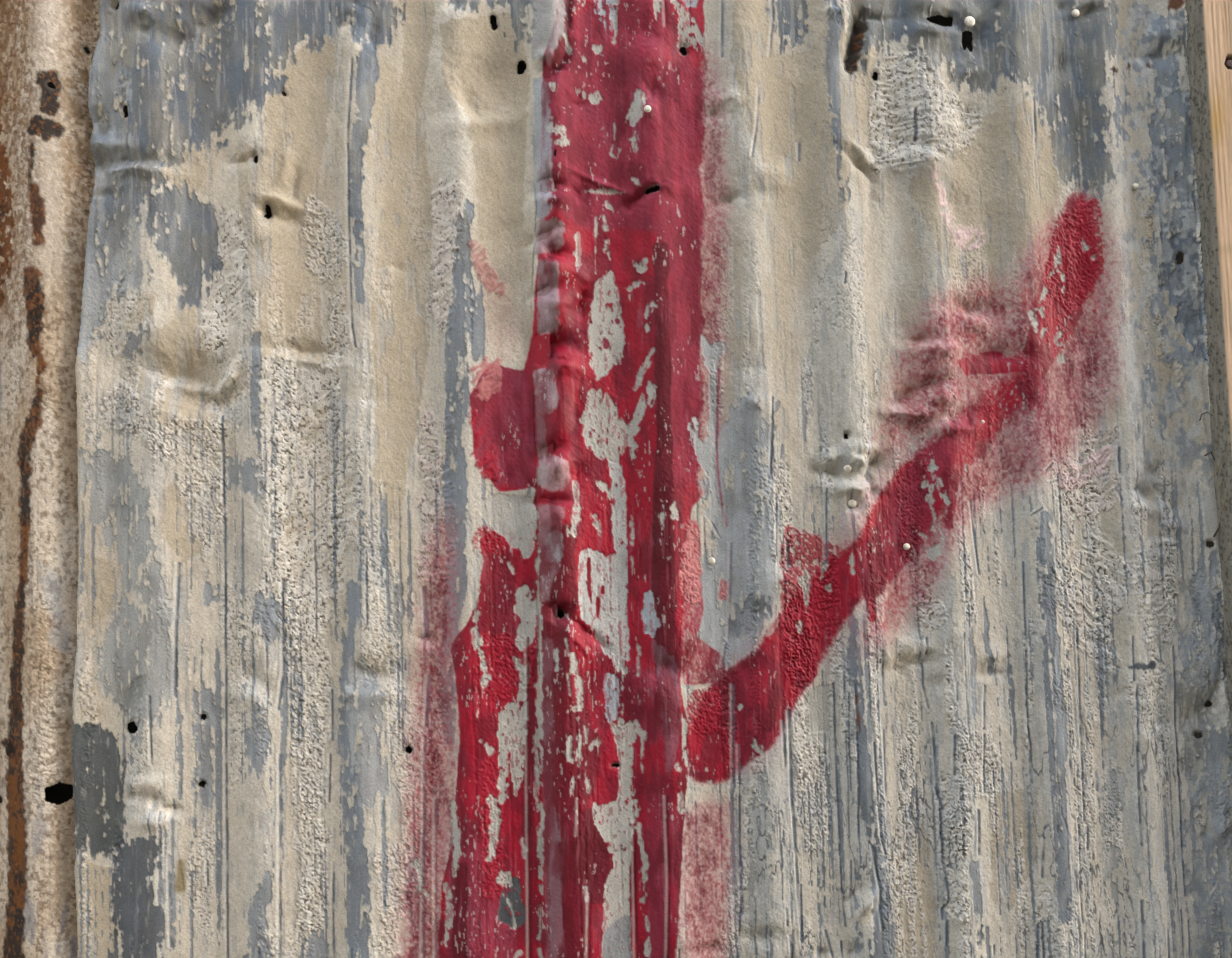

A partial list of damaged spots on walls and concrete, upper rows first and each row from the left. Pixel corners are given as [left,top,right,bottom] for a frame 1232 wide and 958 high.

peeling [443,0,540,47]
peeling [563,0,621,66]
peeling [652,0,705,49]
peeling [22,0,348,364]
peeling [610,89,648,160]
rust [0,69,67,958]
peeling [442,177,662,958]
peeling [45,447,175,958]
peeling [191,682,226,811]
peeling [243,870,274,958]
peeling [300,698,390,958]
peeling [410,799,463,948]